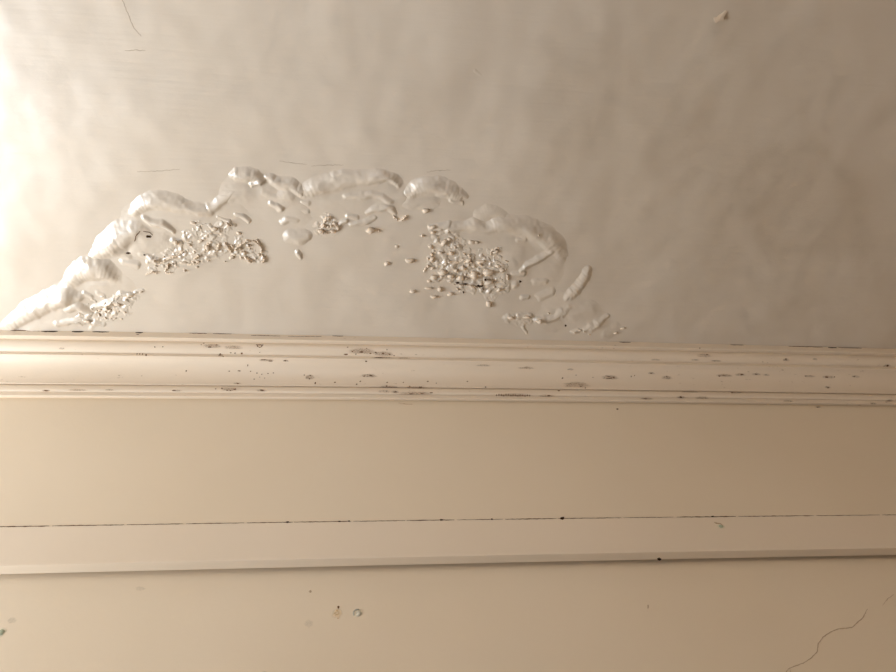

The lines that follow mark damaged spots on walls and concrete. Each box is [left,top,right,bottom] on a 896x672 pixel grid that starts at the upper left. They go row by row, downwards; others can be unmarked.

peeling [144,220,269,275]
peeling [409,225,522,307]
crack [786,594,894,672]